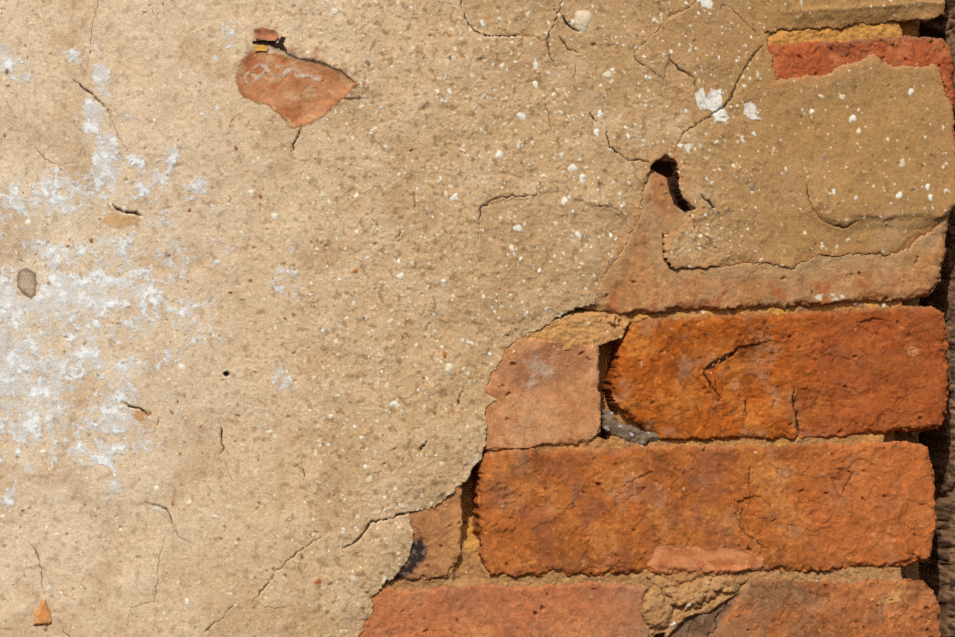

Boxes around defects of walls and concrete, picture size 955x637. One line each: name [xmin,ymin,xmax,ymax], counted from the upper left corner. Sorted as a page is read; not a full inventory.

spalling [236,27,357,128]
crack [461,0,578,81]
crack [634,0,697,88]
crack [675,8,764,151]
crack [590,113,647,162]
crack [478,194,536,235]
crack [127,504,187,629]
crack [206,542,312,631]
crack [344,512,411,548]
spalling [647,544,763,575]